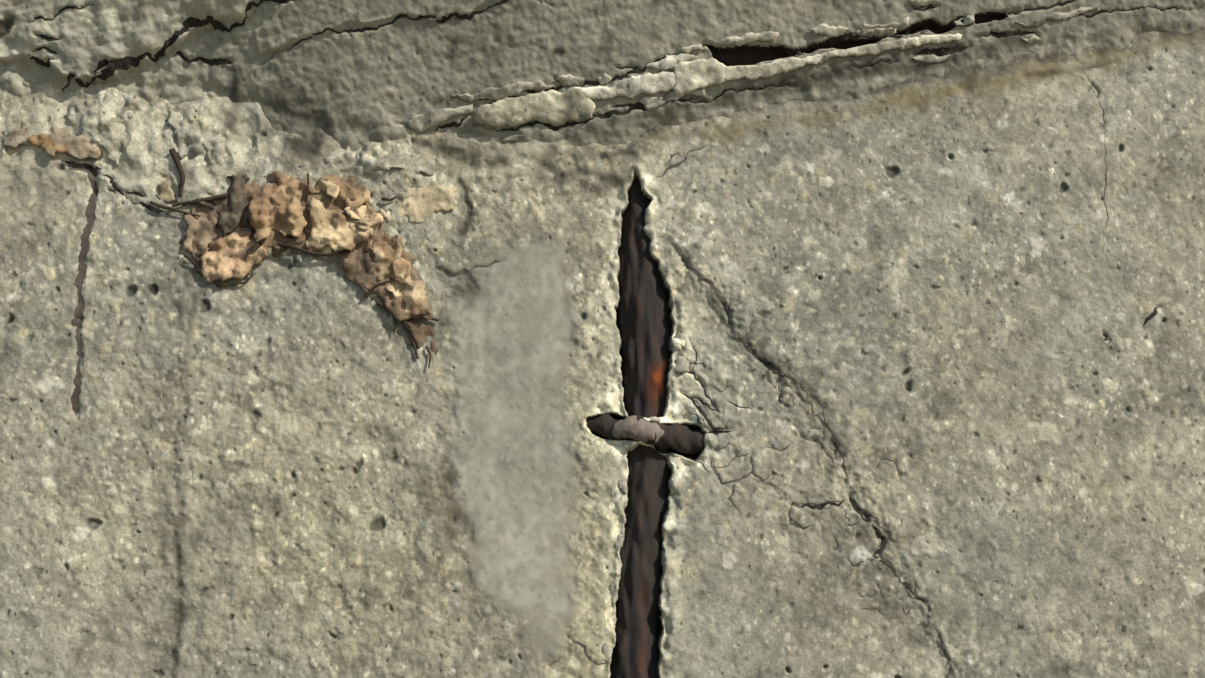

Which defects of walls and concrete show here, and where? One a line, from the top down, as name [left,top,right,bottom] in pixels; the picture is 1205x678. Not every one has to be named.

crack [28,0,291,91]
crack [265,0,509,63]
crack [65,161,167,415]
spalling [653,258,690,383]
spalling [586,398,641,451]
crack [671,244,952,678]
spalling [615,478,628,549]
spalling [649,416,704,678]
spalling [602,632,616,678]